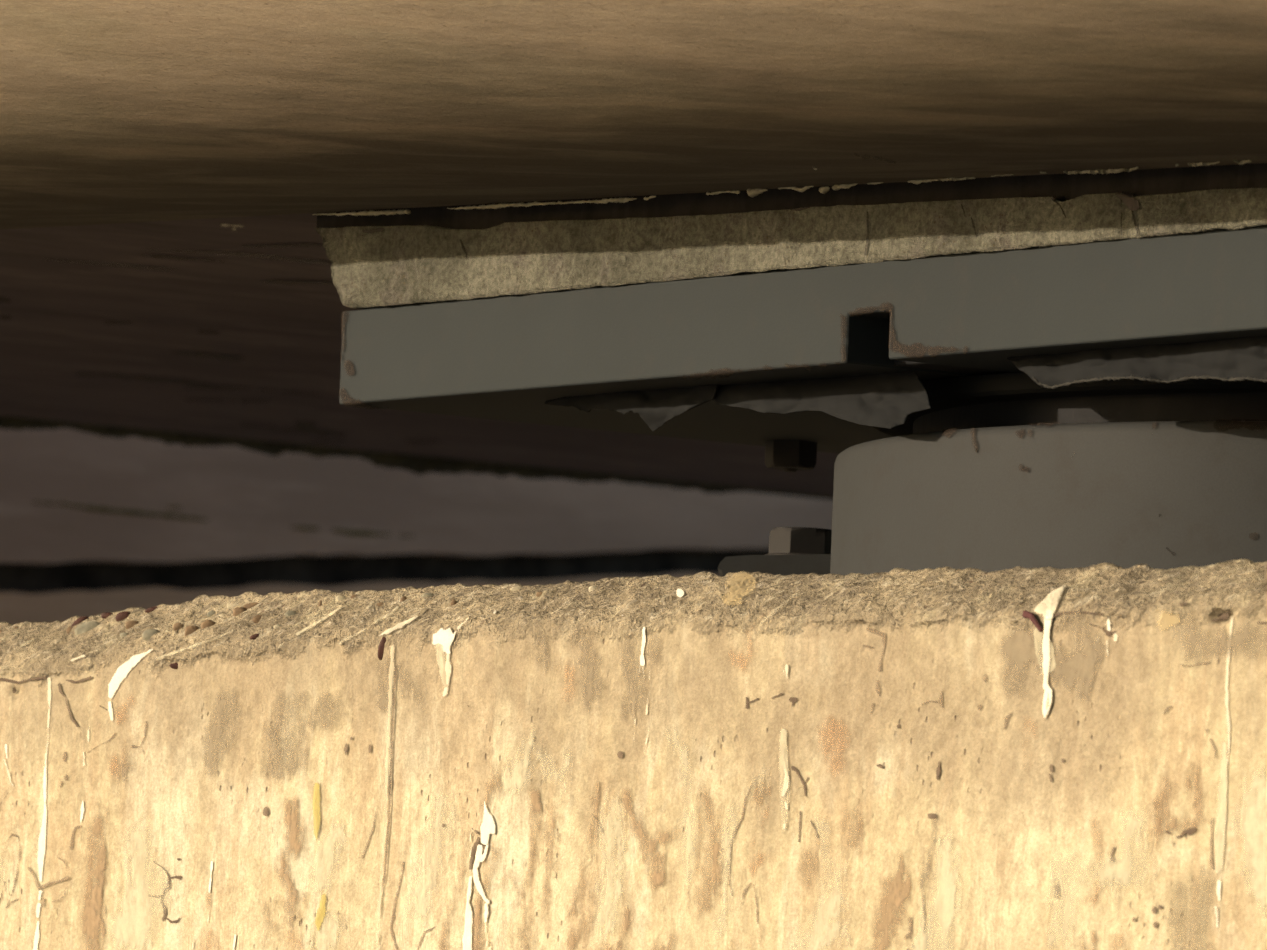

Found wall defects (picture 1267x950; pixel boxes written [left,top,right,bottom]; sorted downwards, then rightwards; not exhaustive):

peeling [1063,167,1138,175]
peeling [706,182,883,198]
peeling [447,195,656,210]
flaking render [1022,610,1043,632]